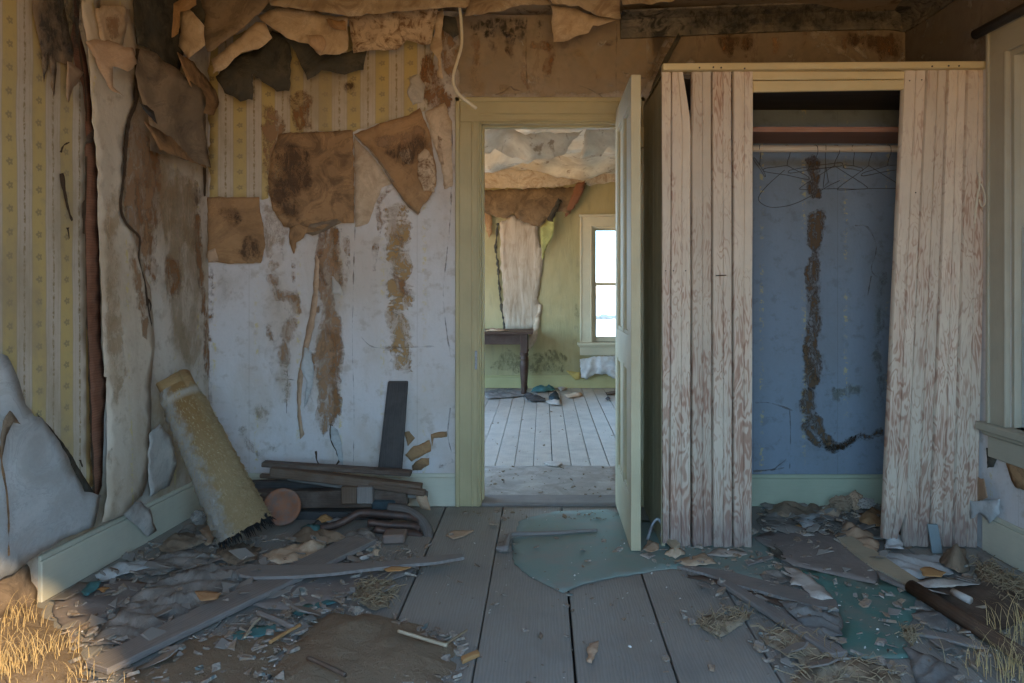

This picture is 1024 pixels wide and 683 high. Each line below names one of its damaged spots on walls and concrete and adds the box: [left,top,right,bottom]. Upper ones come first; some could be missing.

peeling [86,5,137,95]
peeling [177,52,219,116]
peeling [139,101,207,168]
peeling [399,148,436,192]
peeling [545,181,585,222]
peeling [289,219,341,253]
leakage [266,274,302,362]
leakage [312,227,350,434]
leakage [372,191,413,372]
leakage [799,156,884,453]
peeling [0,411,20,457]